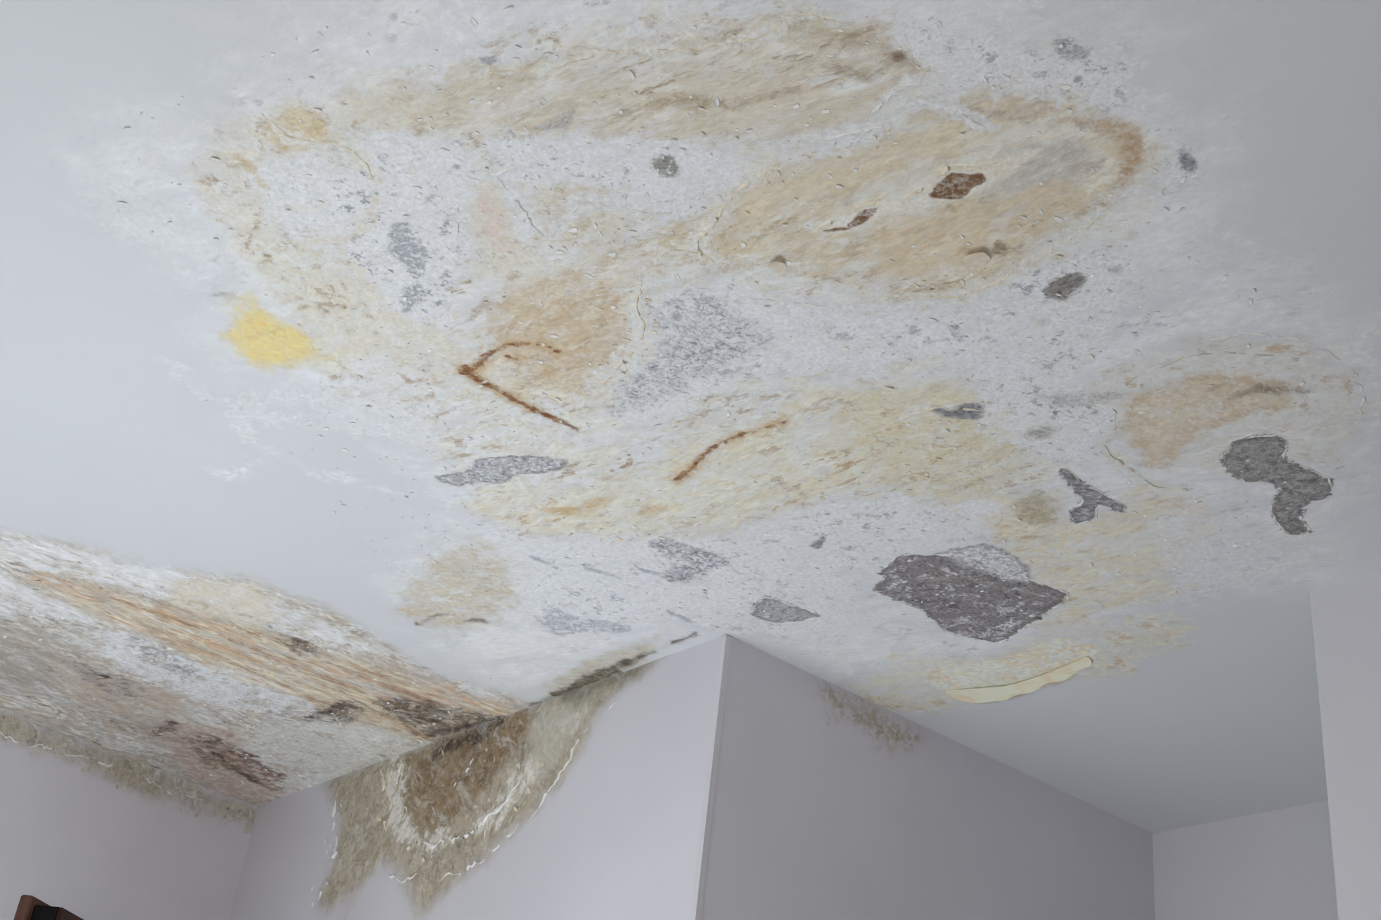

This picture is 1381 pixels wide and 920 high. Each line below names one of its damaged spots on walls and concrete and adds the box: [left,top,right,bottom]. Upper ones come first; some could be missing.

flaking render [433,454,569,488]
flaking render [1058,466,1128,524]
flaking render [1220,433,1334,537]
flaking render [633,537,732,584]
flaking render [533,604,632,637]
flaking render [750,595,822,625]
flaking render [872,542,1102,704]